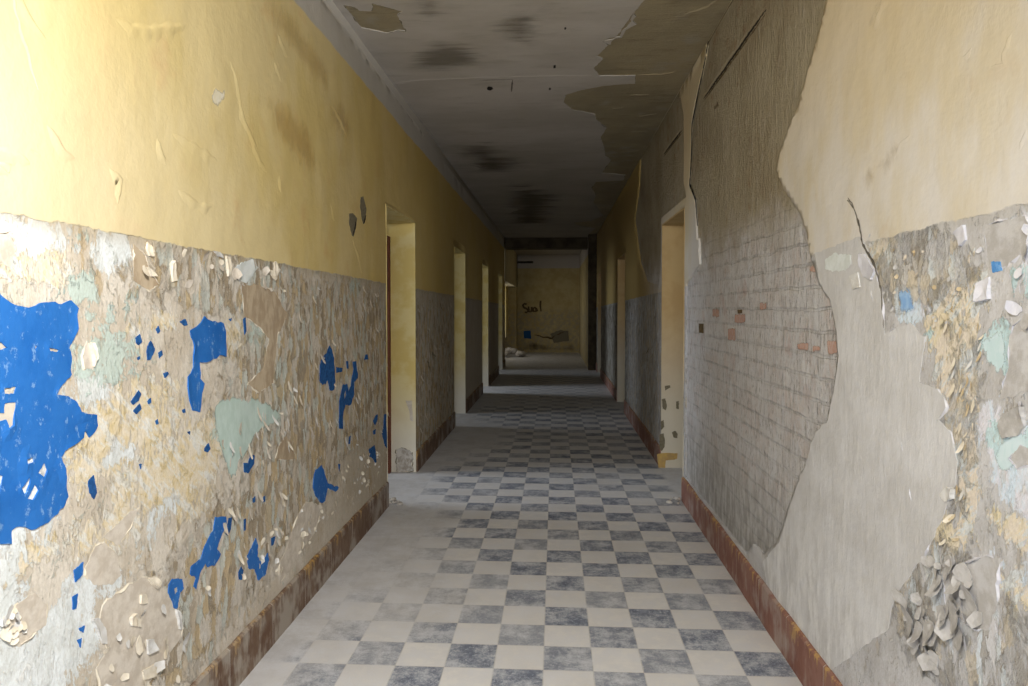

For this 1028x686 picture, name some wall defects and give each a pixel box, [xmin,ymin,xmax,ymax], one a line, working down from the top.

spalling [344,3,406,33]
spalling [564,0,838,553]
crack [847,198,884,328]
flaking render [973,214,1028,302]
flaking render [0,402,15,428]
flaking render [81,341,99,370]
flaking render [203,251,304,473]
peeling [871,249,984,453]
flaking render [994,300,1028,470]
peeling [223,508,253,535]
flaking render [237,406,414,583]
flaking render [892,532,1001,677]